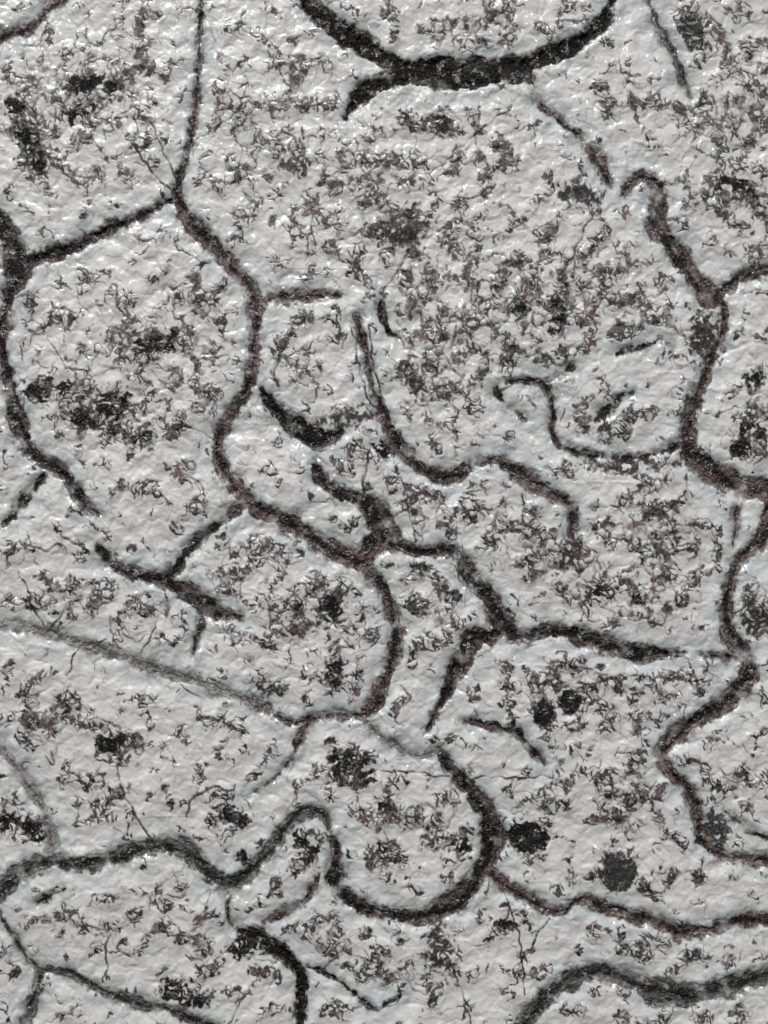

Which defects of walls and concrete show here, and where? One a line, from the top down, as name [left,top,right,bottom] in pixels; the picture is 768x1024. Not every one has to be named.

water stain [4,96,50,180]
water stain [49,73,121,127]
water stain [70,389,158,450]
crack [0,0,693,767]
crack [493,99,768,869]
water stain [533,689,583,729]
crack [0,715,768,944]
water stain [505,821,551,854]
water stain [598,851,638,892]
crack [0,910,215,1024]
crack [237,874,401,1024]
crack [516,963,768,1024]